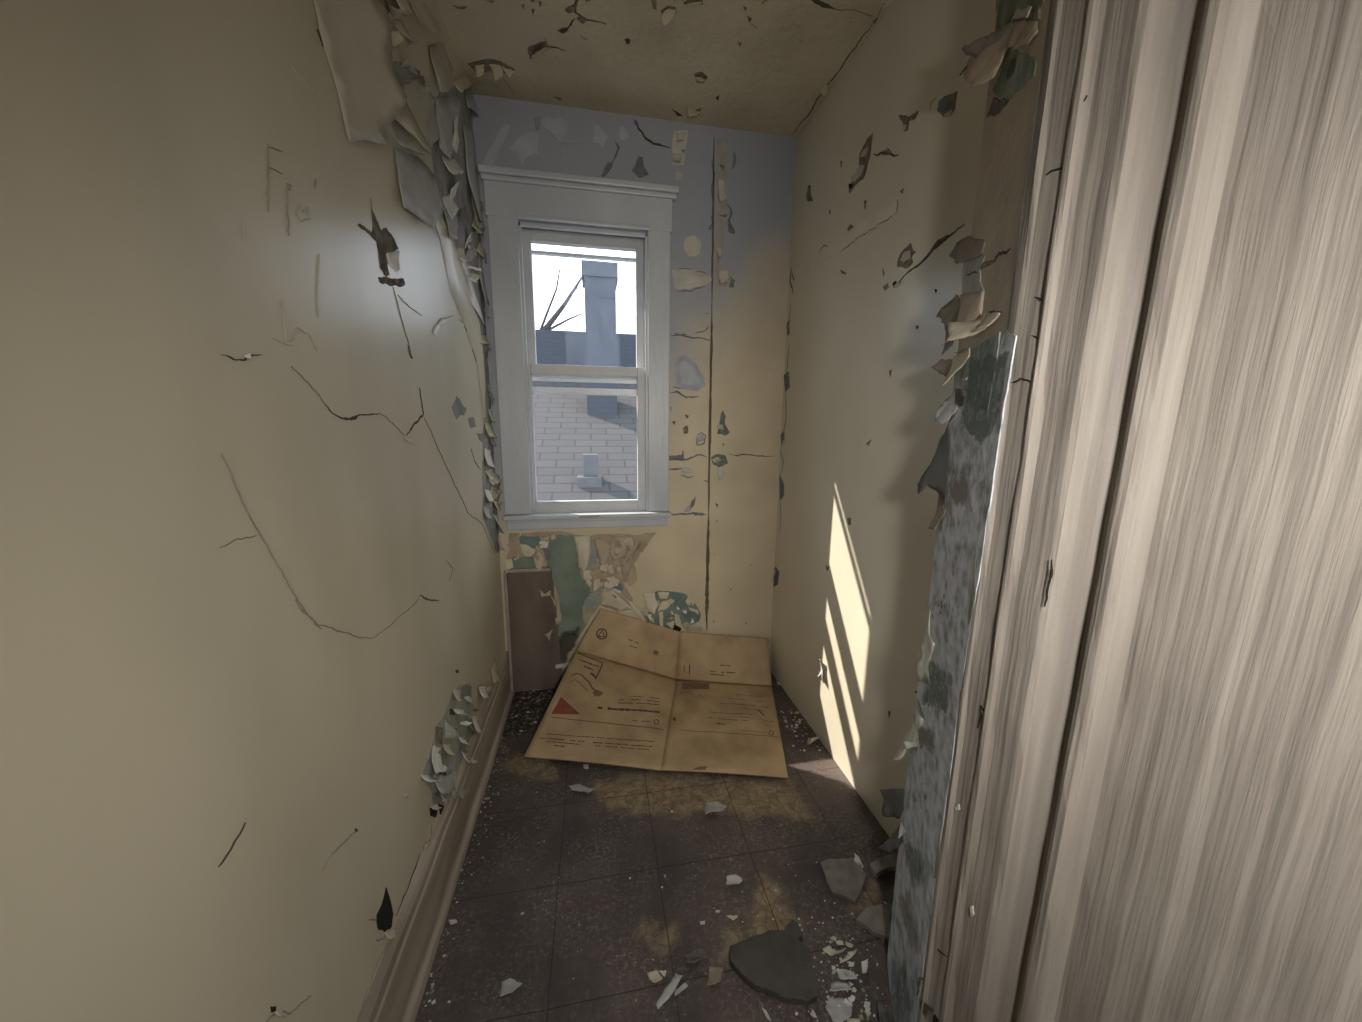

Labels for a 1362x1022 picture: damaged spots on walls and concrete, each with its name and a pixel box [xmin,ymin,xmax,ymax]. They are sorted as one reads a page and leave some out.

crack [558,0,606,40]
peeling [898,0,1044,132]
crack [267,144,317,236]
peeling [840,133,873,209]
peeling [314,0,718,640]
crack [883,224,965,291]
crack [224,254,495,552]
peeling [669,411,730,483]
crack [670,144,771,630]
crack [219,454,453,639]
peeling [420,657,500,817]
spalling [369,887,396,942]